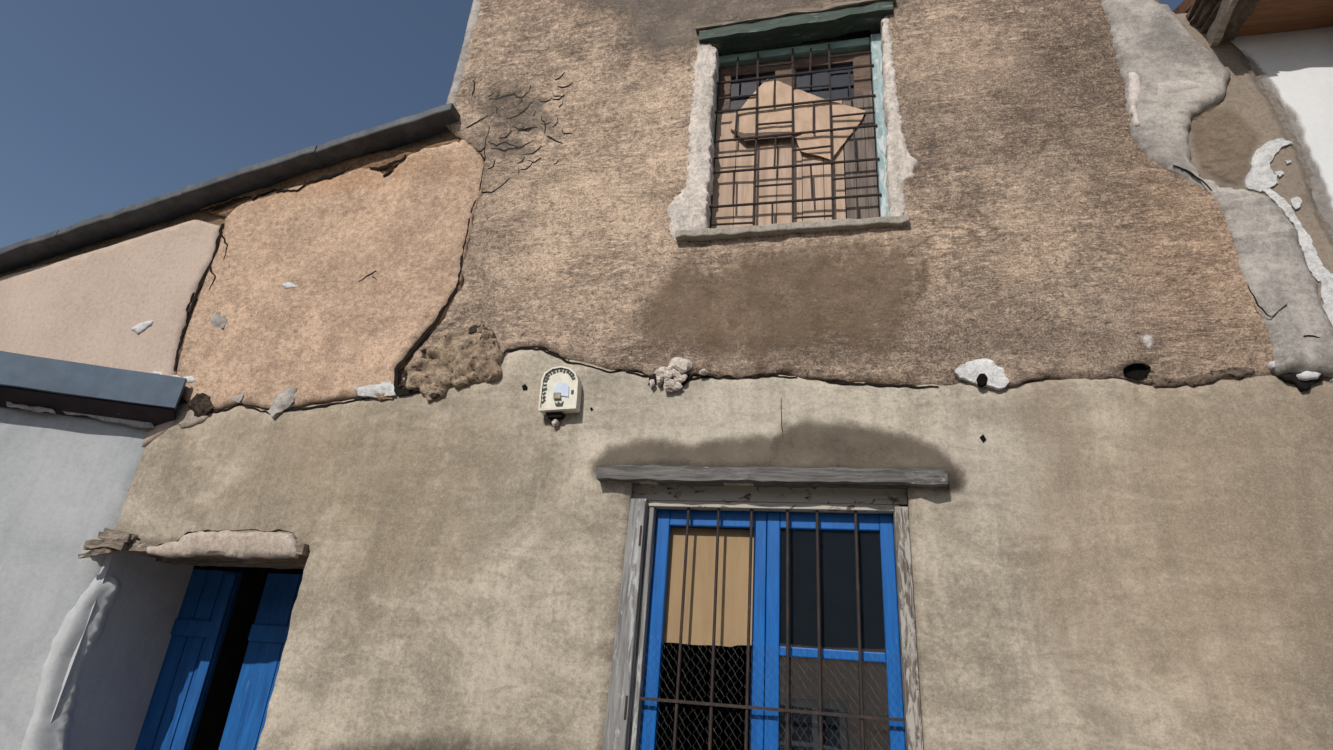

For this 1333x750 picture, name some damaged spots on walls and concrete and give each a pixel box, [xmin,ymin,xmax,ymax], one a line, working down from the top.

crack [212,72,572,414]
peeling [1262,160,1333,328]
crack [174,223,228,371]
leakage [644,245,926,361]
spalling [398,323,504,402]
crack [504,347,648,377]
crack [690,375,939,388]
spalling [1150,360,1323,392]
flaking render [146,530,299,559]